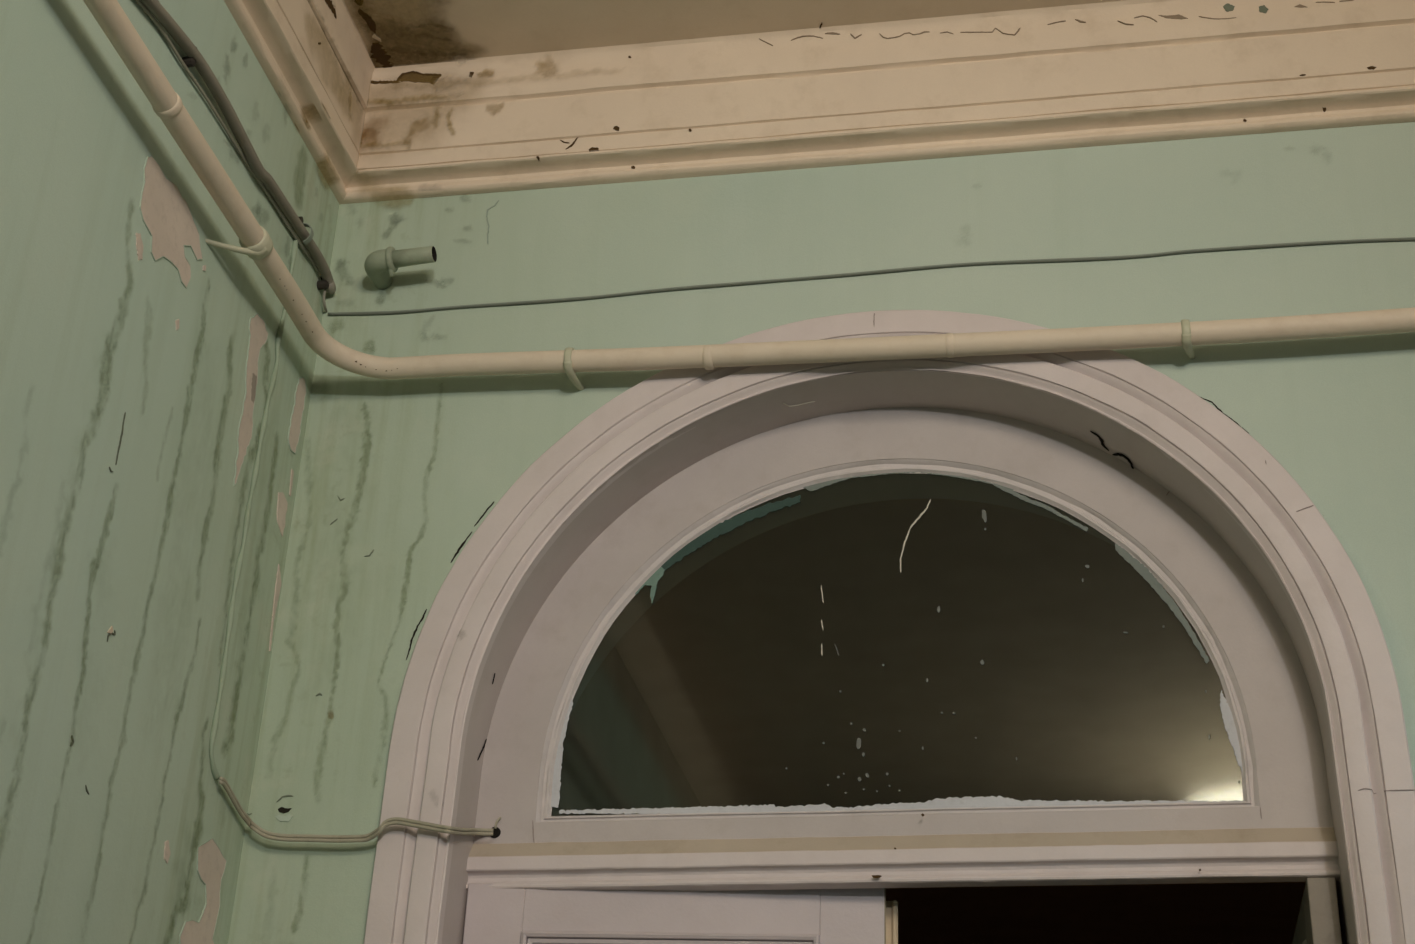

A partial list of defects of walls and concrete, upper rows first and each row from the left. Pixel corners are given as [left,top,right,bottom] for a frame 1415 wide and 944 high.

peeling [1134,3,1236,22]
peeling [135,156,206,288]
peeling [233,313,269,486]
peeling [179,838,227,944]